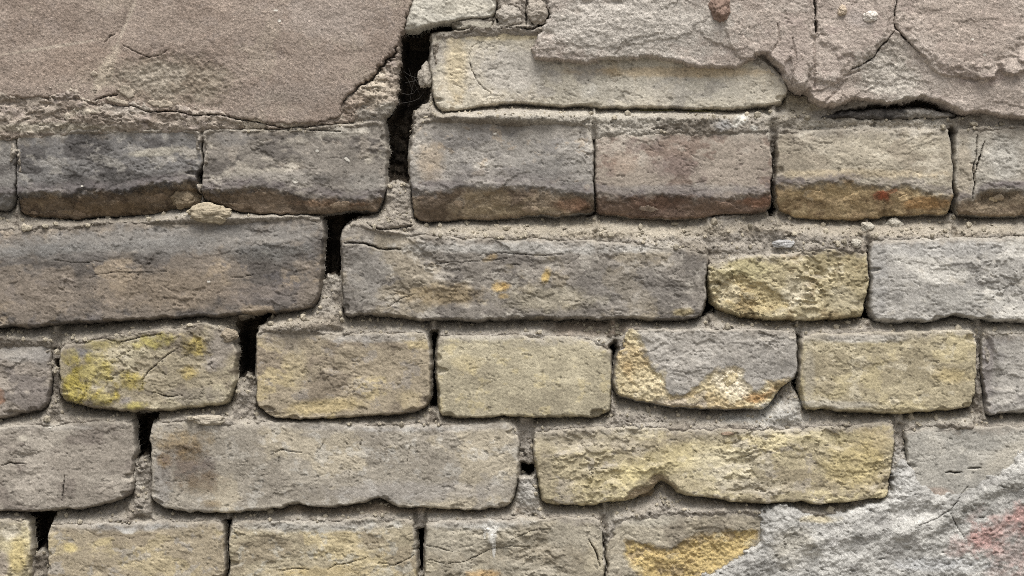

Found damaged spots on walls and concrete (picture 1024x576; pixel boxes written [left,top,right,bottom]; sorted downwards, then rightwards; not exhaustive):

crack [145,110,325,131]
crack [387,28,451,183]
spalling [20,182,382,220]
spalling [412,180,1024,222]
crack [324,213,410,279]
spalling [772,239,795,248]
spalling [719,275,789,314]
crack [236,313,276,377]
spalling [615,329,792,409]
crack [135,395,175,458]
crack [29,480,65,549]
spalling [625,474,676,500]